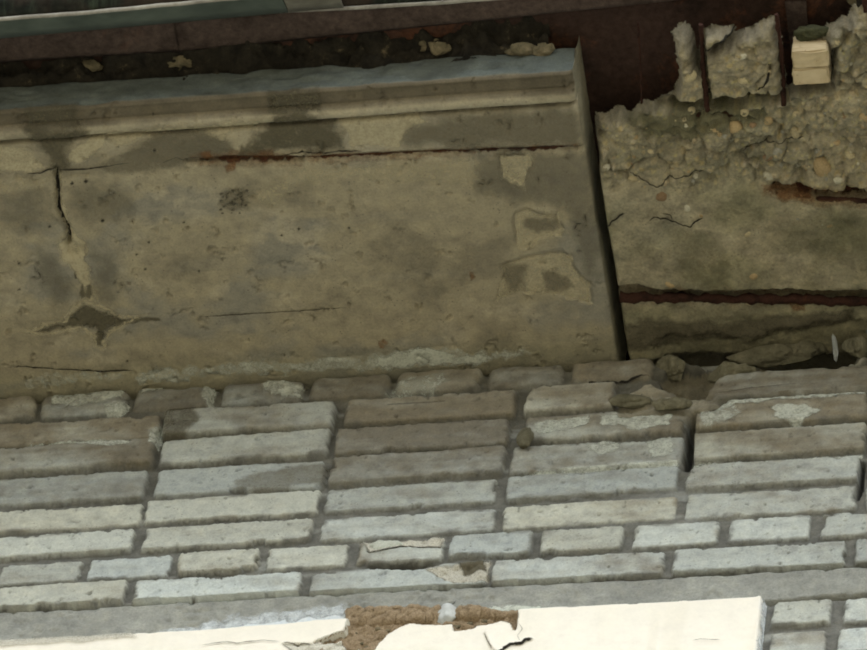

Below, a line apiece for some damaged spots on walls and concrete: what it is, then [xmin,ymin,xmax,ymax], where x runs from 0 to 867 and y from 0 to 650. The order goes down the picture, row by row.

corrosion [806,0,852,26]
corrosion [488,0,793,186]
spalling [671,23,721,127]
spalling [710,108,773,143]
spalling [755,13,867,194]
crack [28,166,106,237]
water stain [0,88,581,349]
corrosion [768,181,865,203]
spalling [793,188,867,204]
spalling [620,282,867,307]
flaking render [282,603,531,650]